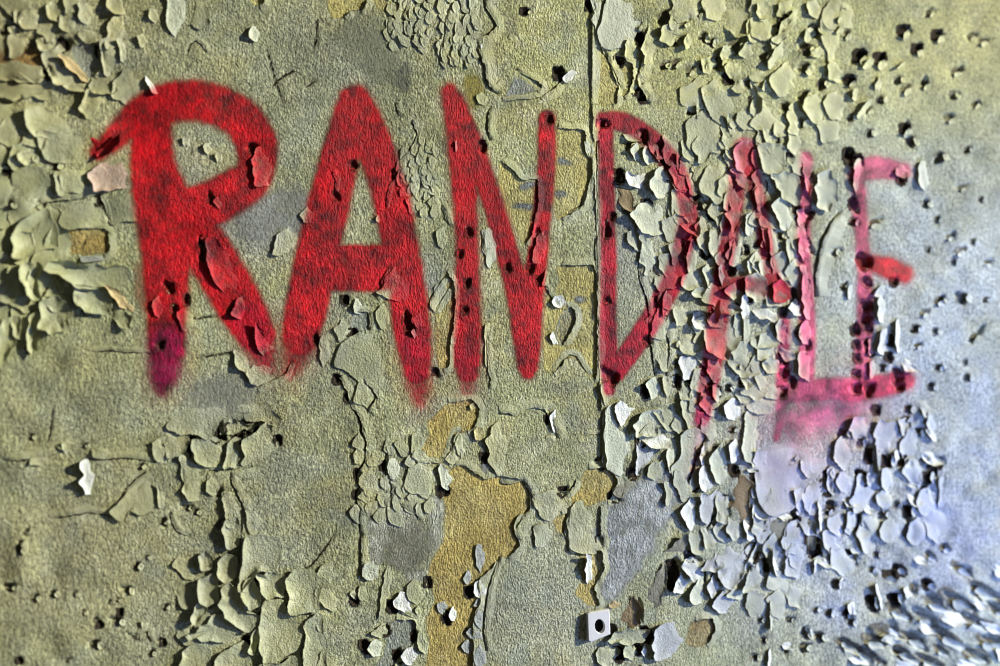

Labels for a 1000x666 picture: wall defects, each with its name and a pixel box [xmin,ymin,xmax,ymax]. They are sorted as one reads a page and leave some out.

peeling [0,0,158,342]
peeling [300,206,314,223]
peeling [312,0,1000,666]
peeling [14,529,32,554]
peeling [30,590,60,602]
peeling [81,586,168,657]